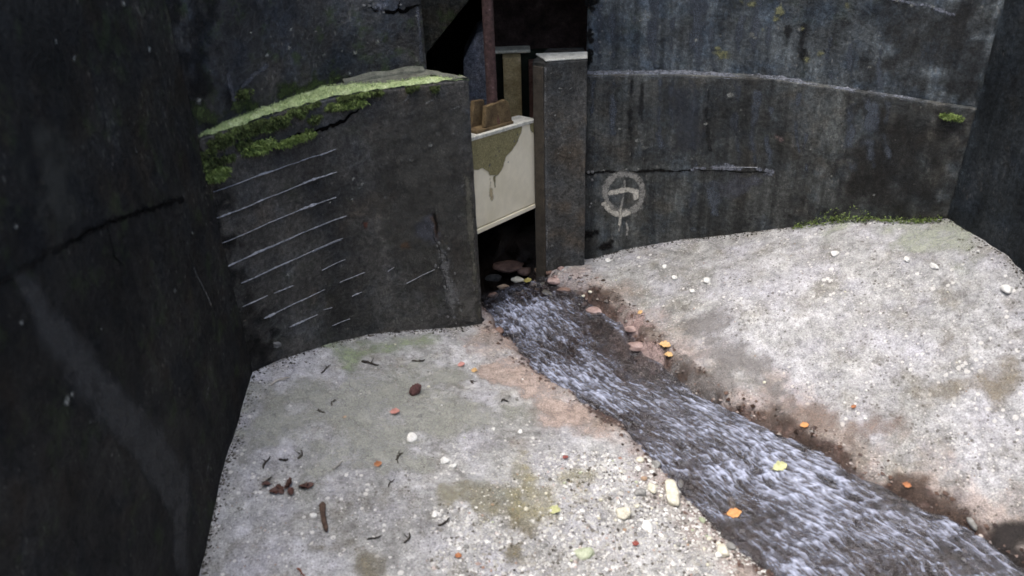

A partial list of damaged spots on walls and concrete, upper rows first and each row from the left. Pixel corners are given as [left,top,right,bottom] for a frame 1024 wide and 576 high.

crack [284,109,359,141]
crack [585,167,767,175]
crack [0,196,185,285]